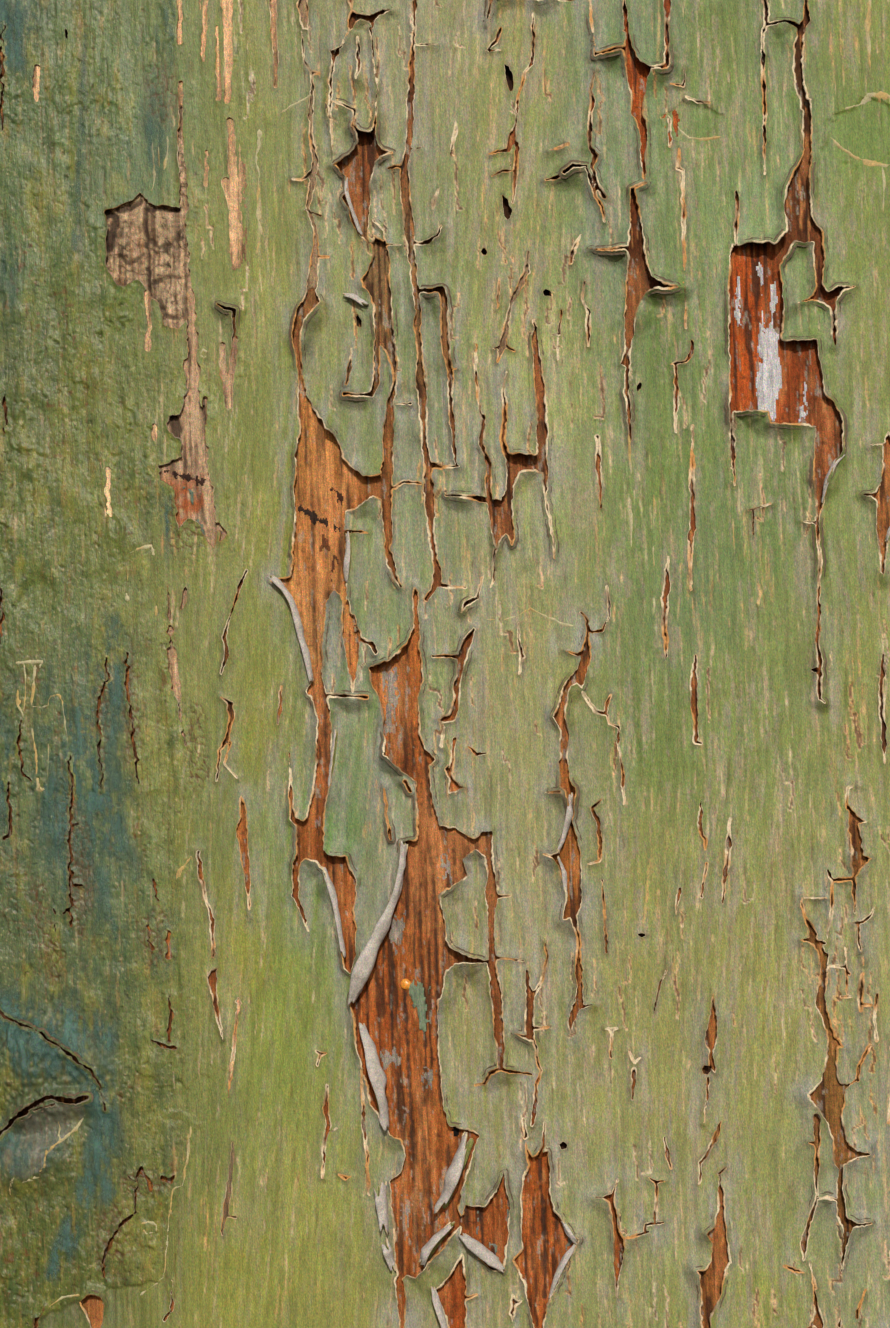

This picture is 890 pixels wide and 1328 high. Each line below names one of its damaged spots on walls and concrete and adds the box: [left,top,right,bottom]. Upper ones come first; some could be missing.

spalling [845,0,890,110]
spalling [829,136,888,210]
peeling [104,0,262,549]
peeling [724,98,848,707]
peeling [859,431,890,575]
crack [0,585,8,648]
crack [2,720,32,841]
crack [52,652,140,932]
peeling [267,109,593,1328]
crack [146,878,172,960]
crack [0,1010,106,1137]